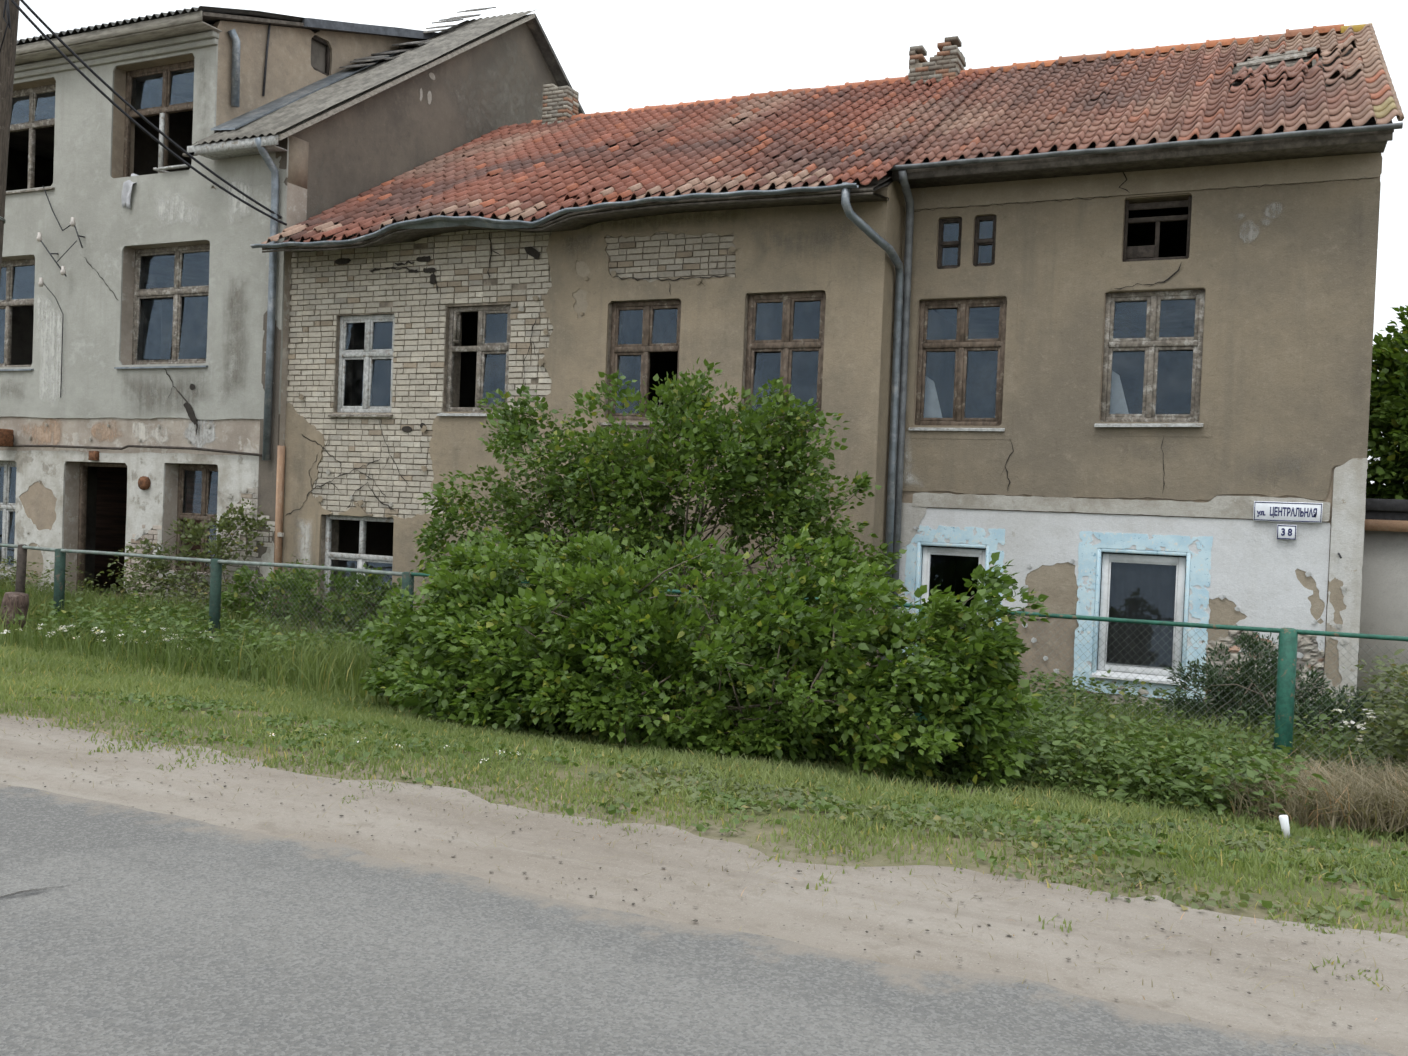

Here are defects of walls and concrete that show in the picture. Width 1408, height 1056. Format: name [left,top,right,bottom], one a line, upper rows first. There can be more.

flaking render [605,231,737,285]
crack [1114,262,1182,289]
flaking render [19,480,57,586]
flaking render [1022,559,1078,674]
flaking render [1072,594,1277,724]
flaking render [1295,568,1347,700]